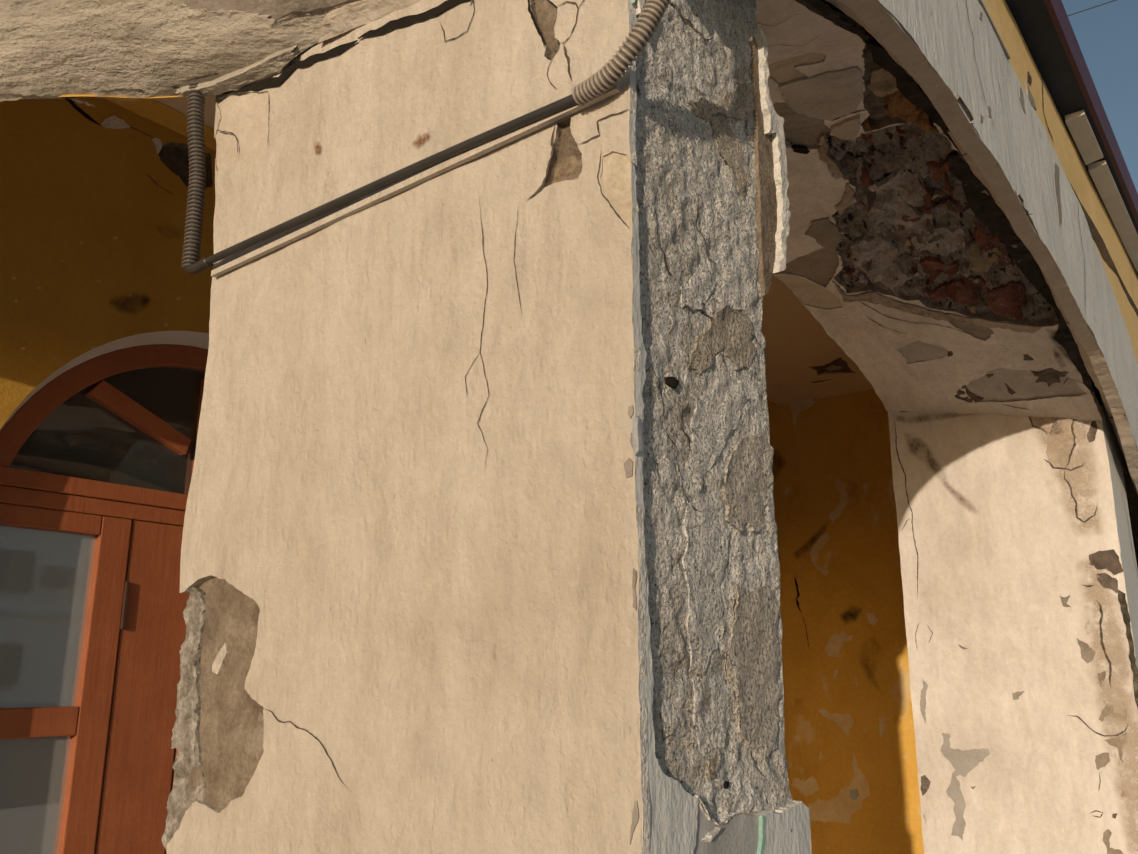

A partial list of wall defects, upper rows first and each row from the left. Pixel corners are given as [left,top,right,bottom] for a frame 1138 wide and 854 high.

crack [0,0,465,138]
crack [513,205,522,314]
crack [465,201,489,472]
spalling [624,0,1062,854]
peeling [955,354,1098,523]
peeling [1083,549,1123,594]
spalling [1123,471,1138,569]
peeling [1077,601,1112,688]
spalling [162,575,229,854]
spalling [250,708,347,788]
peeling [1068,706,1129,791]
peeling [1089,810,1123,854]